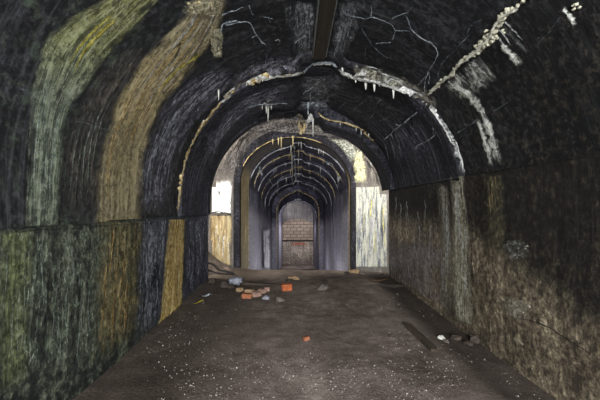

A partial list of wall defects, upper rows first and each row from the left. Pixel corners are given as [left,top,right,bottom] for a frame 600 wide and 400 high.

damp [11,0,156,374]
crack [222,5,280,44]
damp [69,0,525,324]
crack [343,8,480,95]